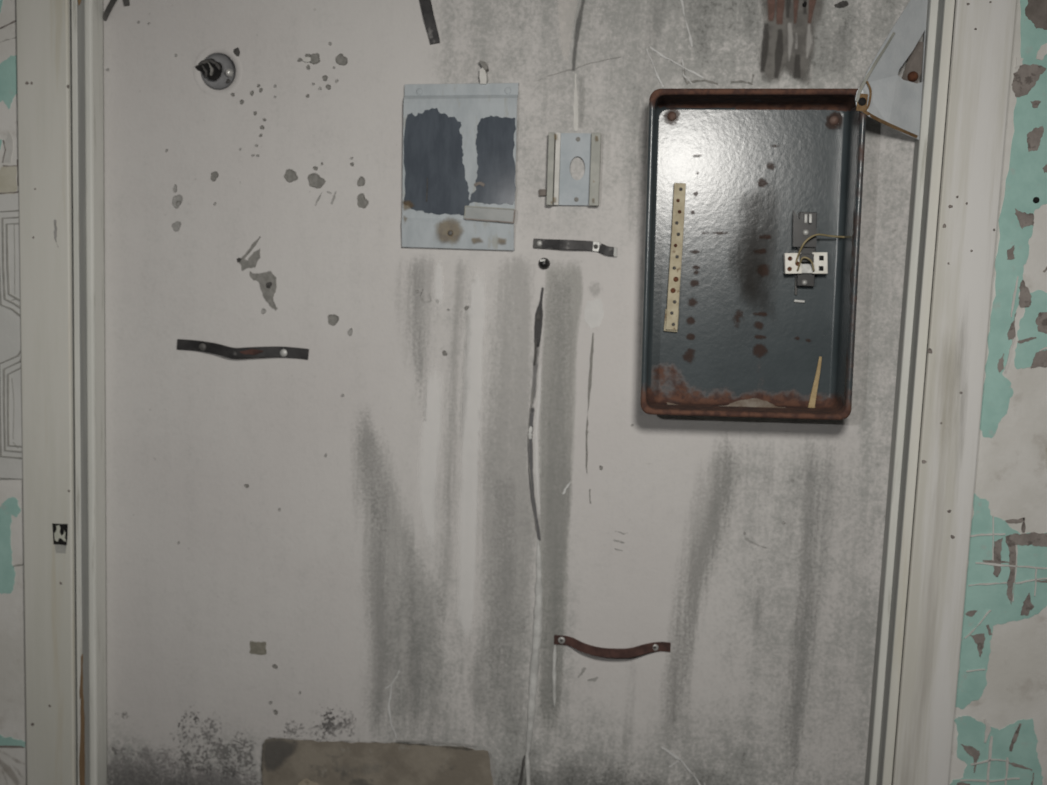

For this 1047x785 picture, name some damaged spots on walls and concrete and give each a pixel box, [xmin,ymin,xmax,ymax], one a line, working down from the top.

peeling [0,55,33,109]
spalling [297,53,320,70]
spalling [306,42,348,98]
spalling [172,184,183,232]
spalling [284,162,337,206]
spalling [350,157,369,209]
peeling [980,0,1047,438]
spalling [237,236,278,314]
spalling [328,314,339,326]
peeling [0,497,21,594]
peeling [950,493,1047,785]
peeling [0,735,26,748]